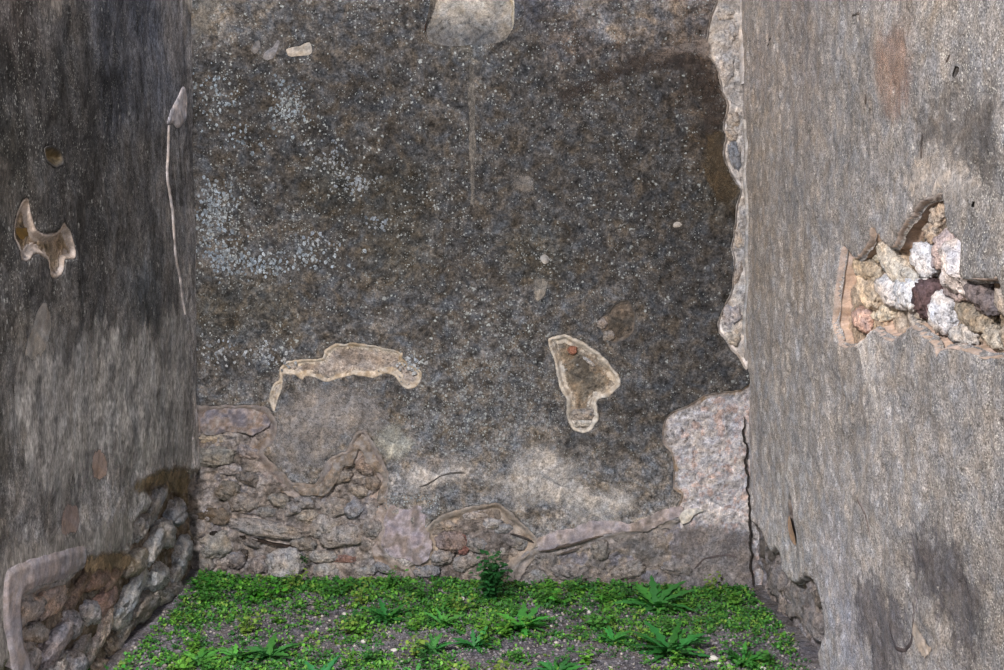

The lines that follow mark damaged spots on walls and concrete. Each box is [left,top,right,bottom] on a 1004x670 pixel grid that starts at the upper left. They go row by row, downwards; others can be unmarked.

flaking render [14,198,76,279]
flaking render [167,87,187,128]
flaking render [251,40,312,60]
flaking render [597,300,636,343]
flaking render [706,0,748,370]
flaking render [832,193,1004,360]
flaking render [3,334,824,670]
crack [694,417,754,587]